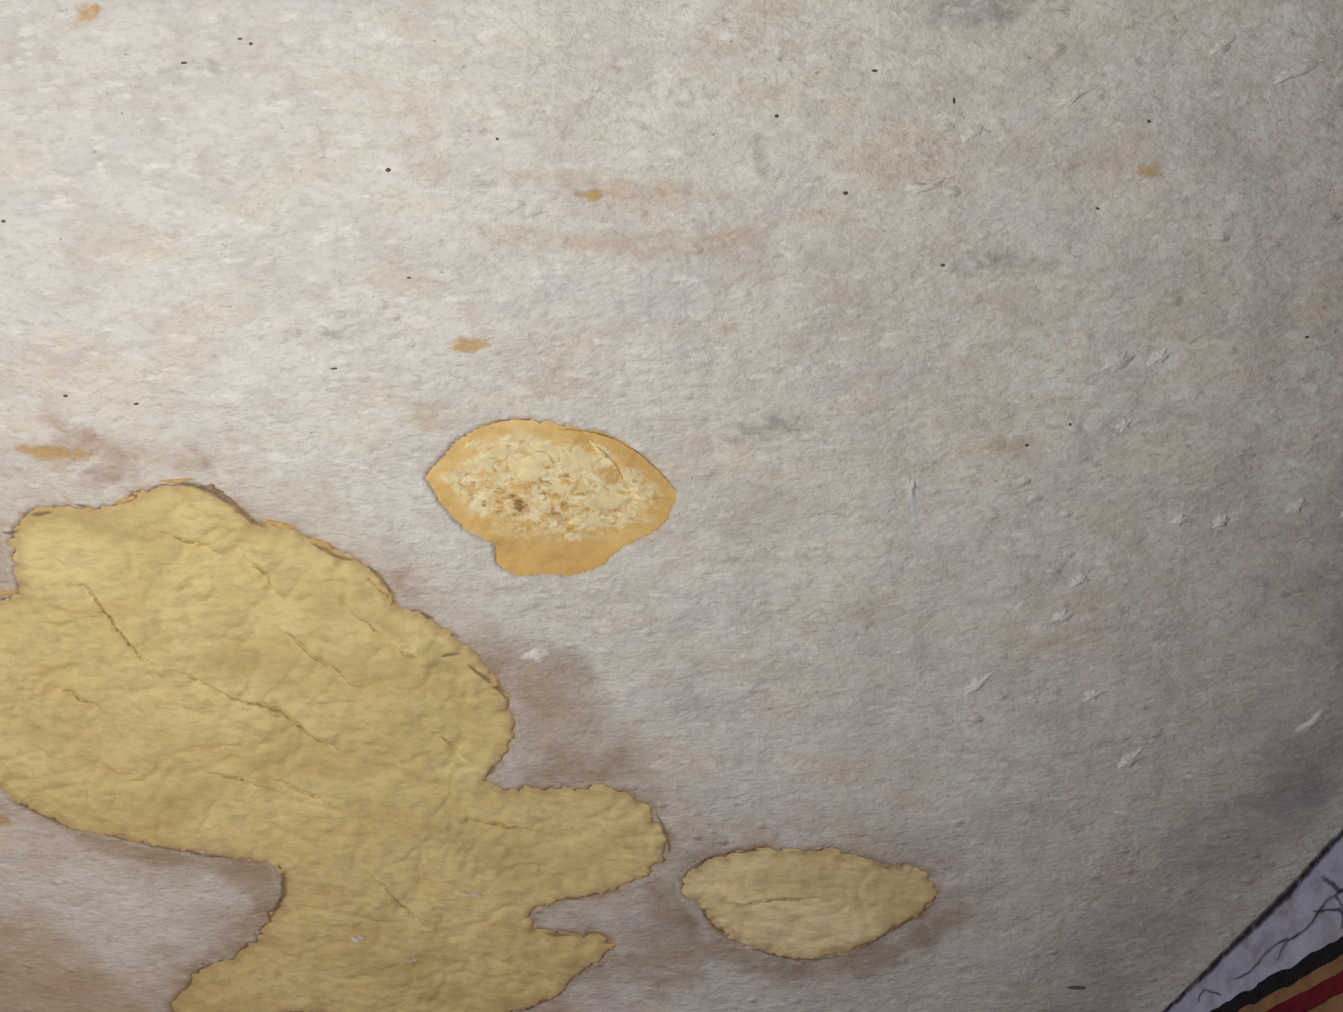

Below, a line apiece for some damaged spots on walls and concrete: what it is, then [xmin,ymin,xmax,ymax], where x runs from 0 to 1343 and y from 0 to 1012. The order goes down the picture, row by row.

flaking render [426,418,676,577]
flaking render [0,478,670,1012]
flaking render [682,847,938,960]